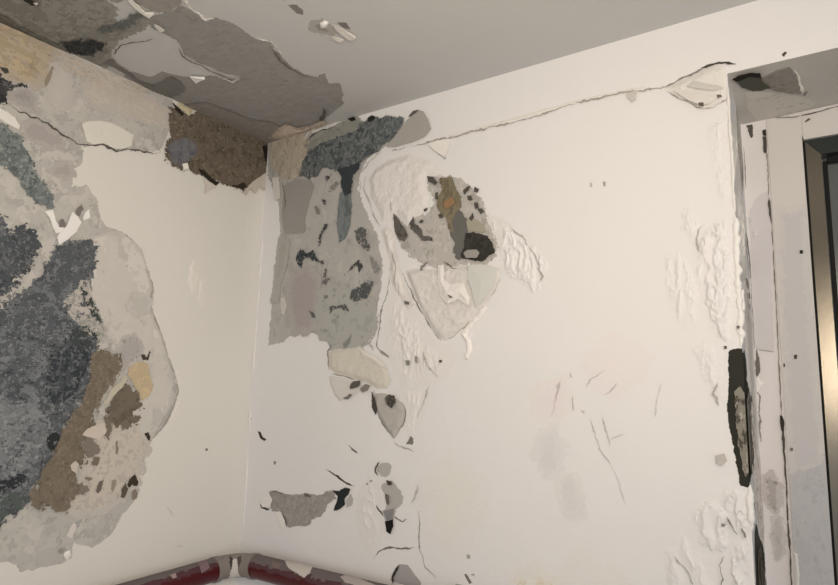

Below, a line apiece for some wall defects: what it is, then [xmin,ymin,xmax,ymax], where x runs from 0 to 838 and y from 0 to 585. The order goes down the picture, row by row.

crack [8,103,156,154]
peeling [0,0,389,345]
crack [358,62,734,226]
flaking render [761,67,808,96]
flaking render [0,280,153,572]
flaking render [145,267,179,441]
peeling [326,341,406,438]
flaking render [716,346,764,488]
flaking render [260,490,336,528]
flaking render [375,462,404,534]
spalling [390,564,421,585]
flaking render [755,524,767,585]